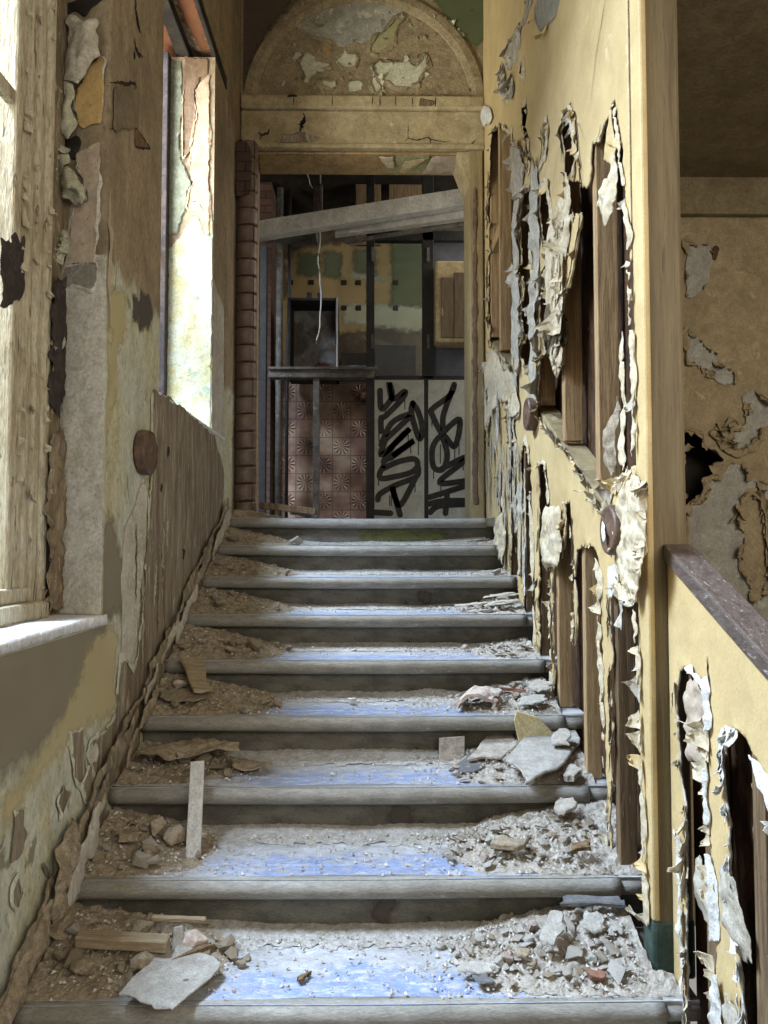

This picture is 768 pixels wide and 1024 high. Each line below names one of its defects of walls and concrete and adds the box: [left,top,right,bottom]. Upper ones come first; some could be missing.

peeling [282,3,436,107]
peeling [493,0,560,106]
peeling [169,56,212,236]
crack [372,96,475,144]
flaking render [0,56,107,612]
peeling [502,254,545,341]
peeling [685,390,768,621]
peeling [588,567,635,628]
flaking render [42,389,224,941]
peeling [673,718,738,825]
peeling [667,804,731,906]
peeling [676,947,715,1000]